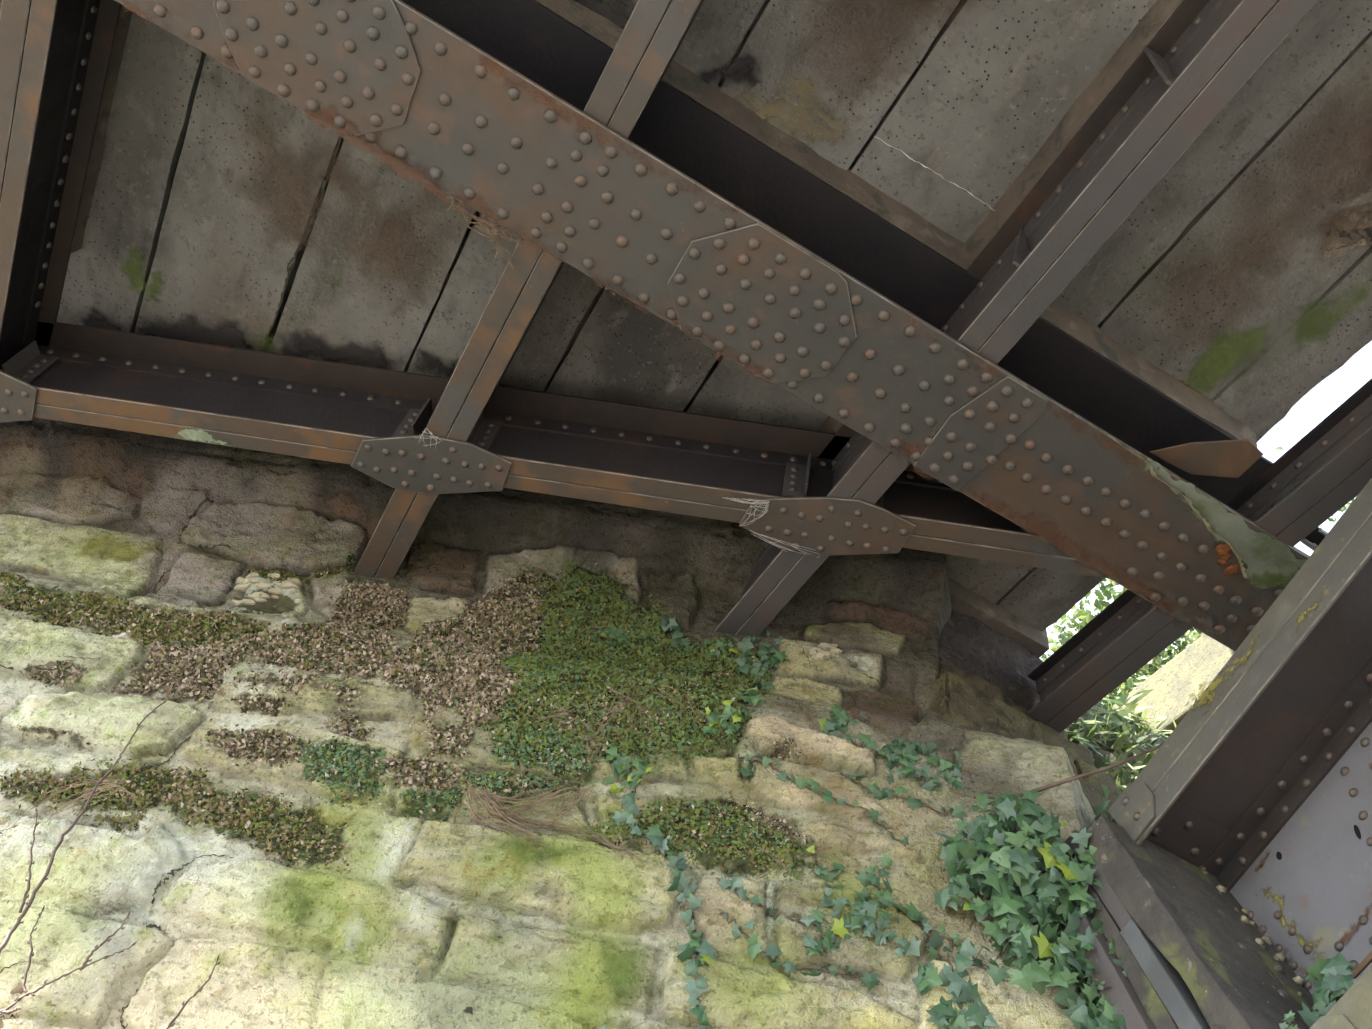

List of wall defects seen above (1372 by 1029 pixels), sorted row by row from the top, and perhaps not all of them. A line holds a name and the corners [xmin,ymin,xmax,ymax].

leakage [701,55,850,142]
crack [142,497,230,596]
rust [959,490,1174,612]
peeling [1088,423,1307,589]